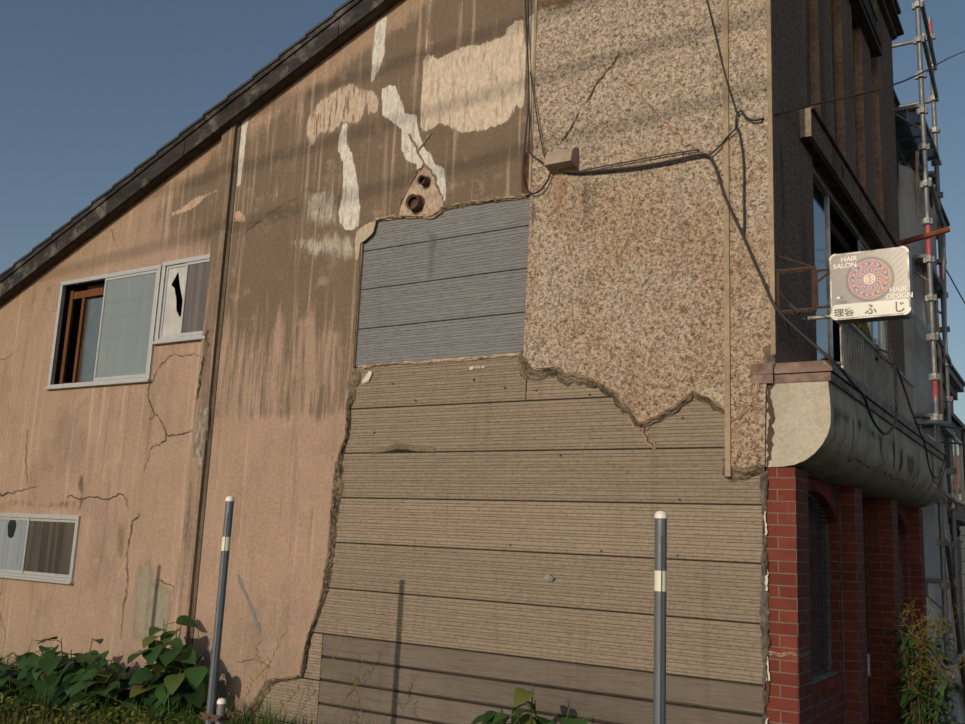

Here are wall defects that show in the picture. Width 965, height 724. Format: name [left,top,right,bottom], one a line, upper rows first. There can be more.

peeling [295,14,534,259]
crack [0,433,31,497]
crack [66,493,139,637]
crack [142,330,208,473]
spalling [240,350,725,724]
spalling [722,458,768,498]